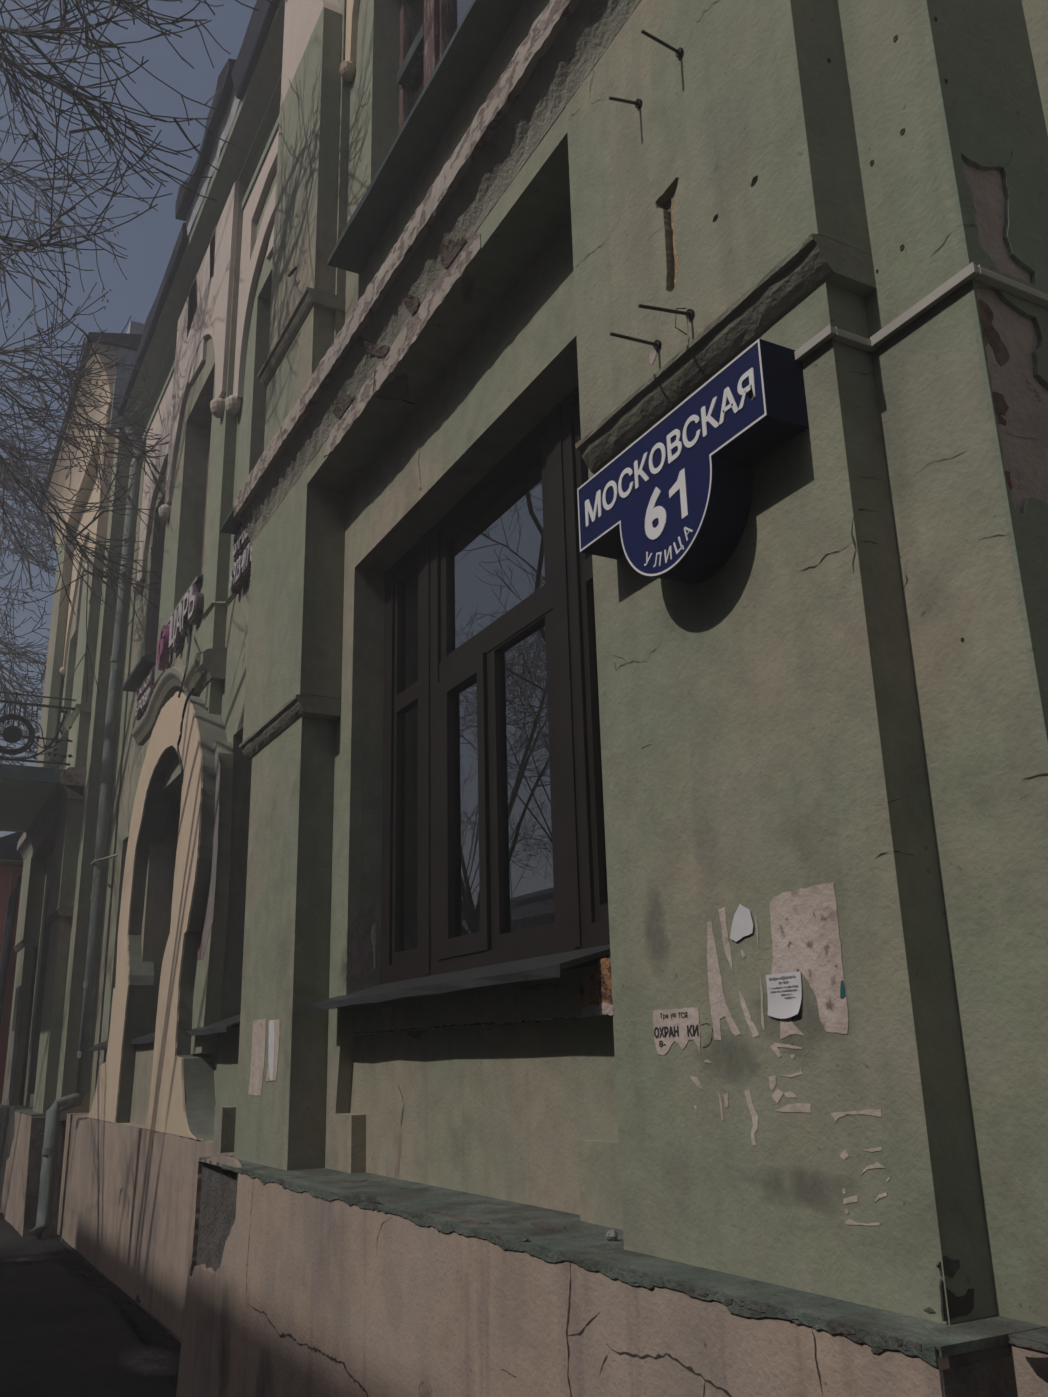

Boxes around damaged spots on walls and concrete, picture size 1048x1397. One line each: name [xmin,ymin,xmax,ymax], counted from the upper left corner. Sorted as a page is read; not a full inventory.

flaking render [962,160,1031,283]
flaking render [976,289,1048,514]
flaking render [195,1156,243,1272]
crack [246,1180,368,1397]
crack [566,1261,732,1397]
crack [811,1329,823,1397]
spalling [924,1256,974,1321]